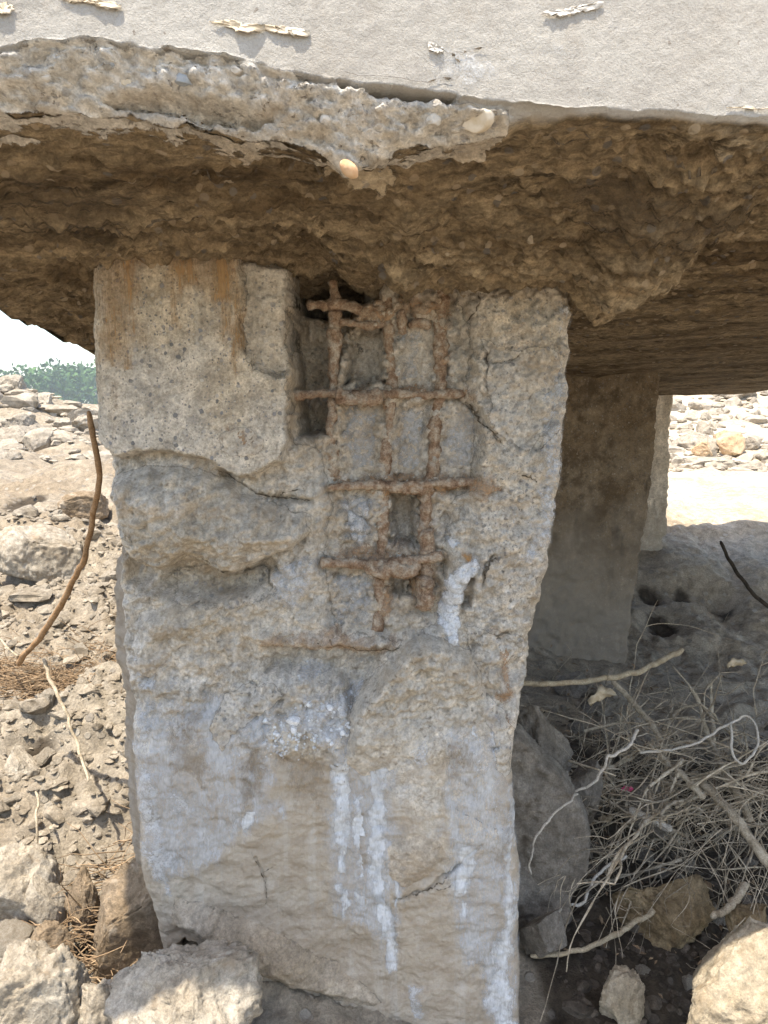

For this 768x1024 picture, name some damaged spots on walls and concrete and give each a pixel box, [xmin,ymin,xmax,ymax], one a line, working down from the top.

peeling [542,1,604,17]
peeling [209,19,310,37]
spalling [0,36,509,197]
spalling [236,260,561,642]
crack [216,469,310,501]
corrosion [333,473,423,496]
damp [437,559,480,646]
damp [133,681,400,972]
crack [394,872,452,902]